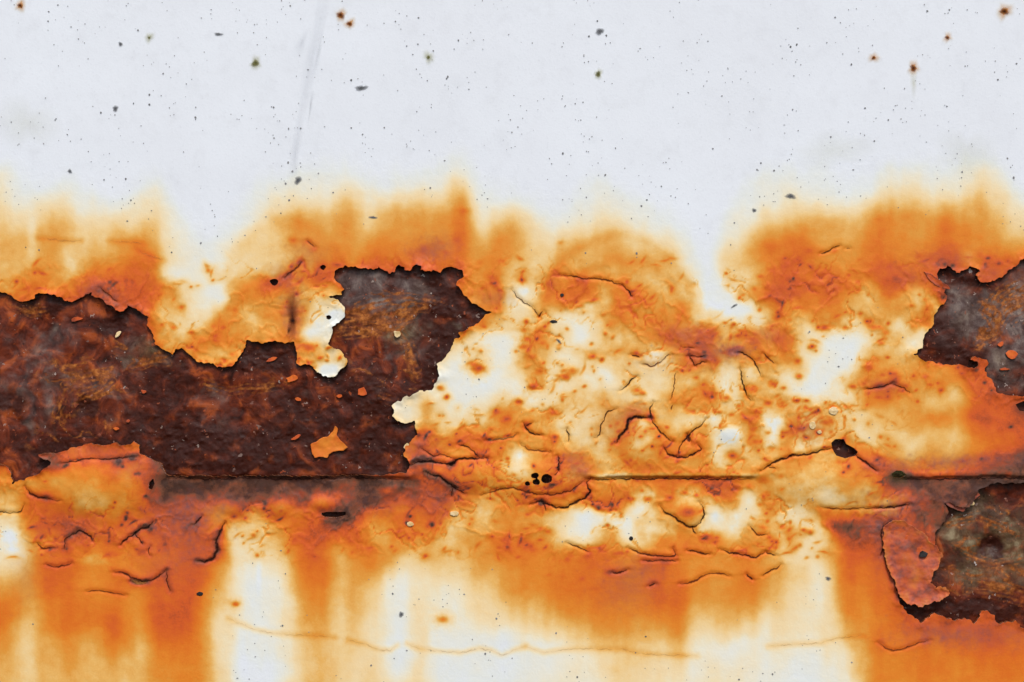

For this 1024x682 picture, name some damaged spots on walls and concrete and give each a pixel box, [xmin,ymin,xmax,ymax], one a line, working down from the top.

crack [565,275,632,296]
corrosion [0,137,1024,682]
crack [414,347,828,586]
crack [38,530,92,567]
crack [88,523,170,595]
crack [195,516,223,563]
peeling [882,520,950,607]